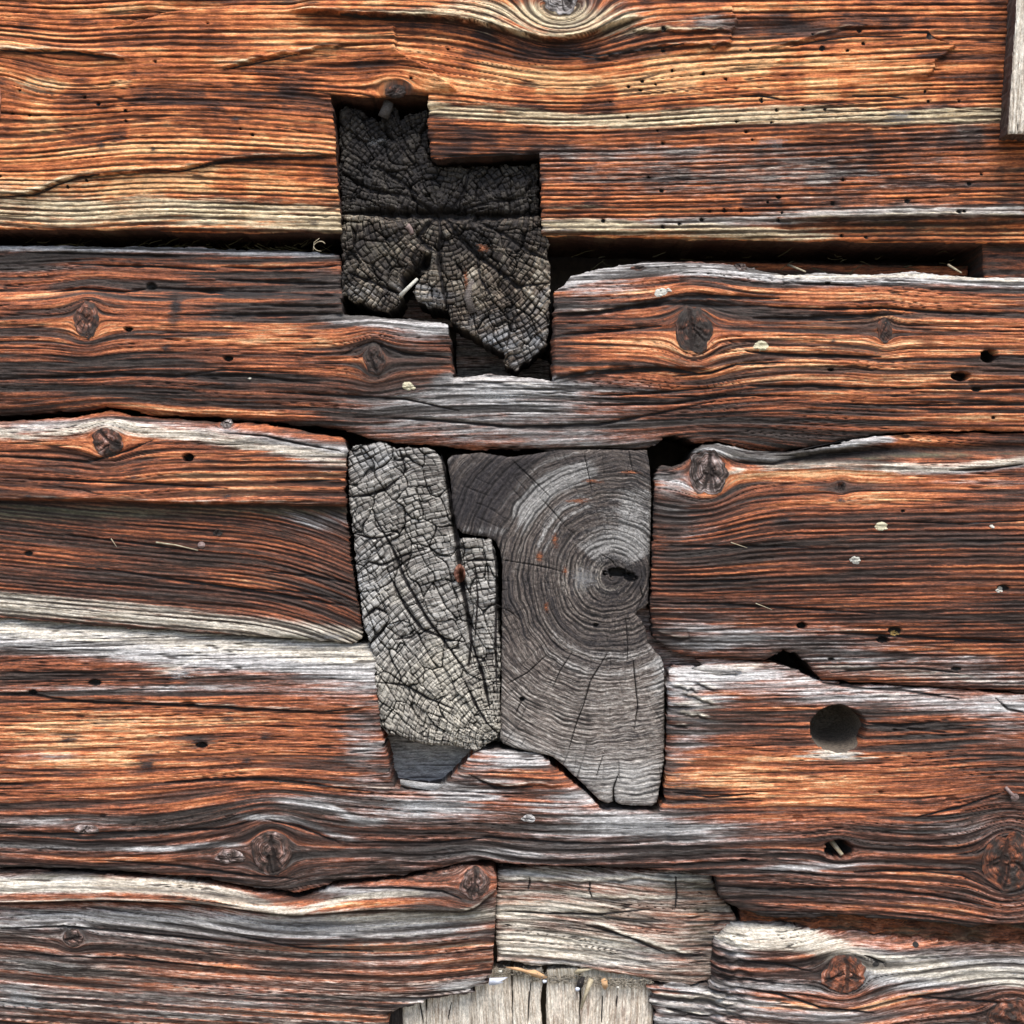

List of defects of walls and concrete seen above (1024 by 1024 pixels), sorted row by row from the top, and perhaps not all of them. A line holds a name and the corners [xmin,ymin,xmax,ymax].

crack [342,122,549,345]
crack [353,449,573,732]
crack [569,592,642,748]